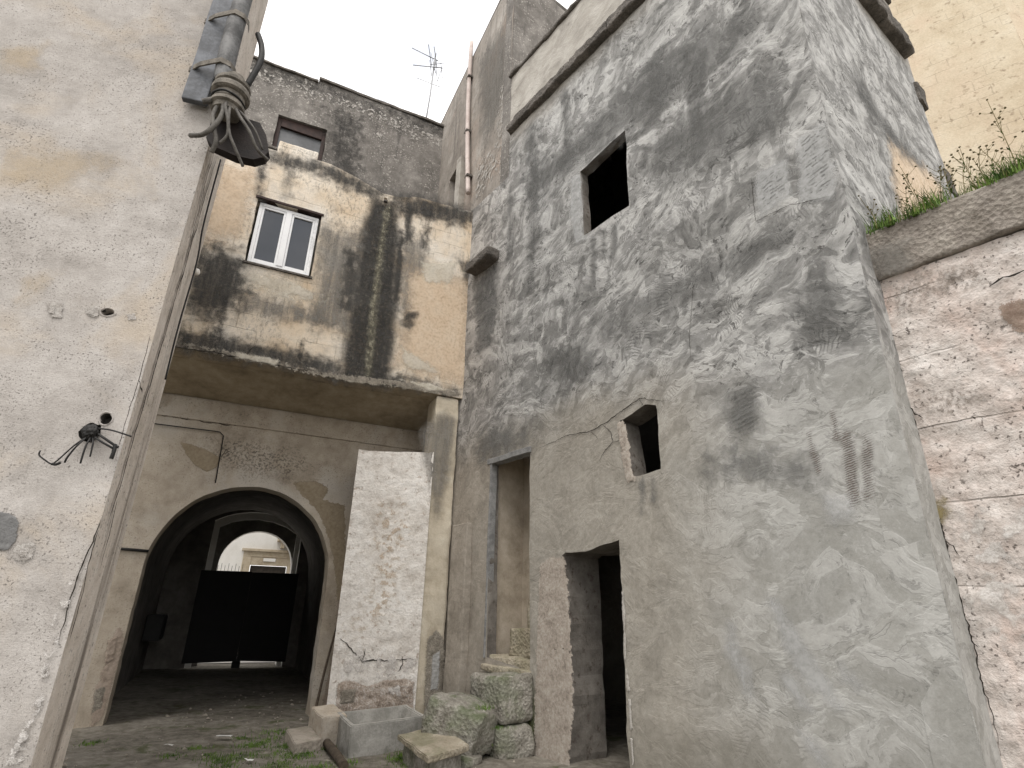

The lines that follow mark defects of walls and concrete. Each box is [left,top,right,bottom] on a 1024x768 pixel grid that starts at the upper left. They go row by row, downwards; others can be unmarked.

leakage [176,111,473,395]
peeling [181,442,221,471]
crack [542,398,661,461]
flaking render [293,480,445,715]
crack [341,639,414,670]